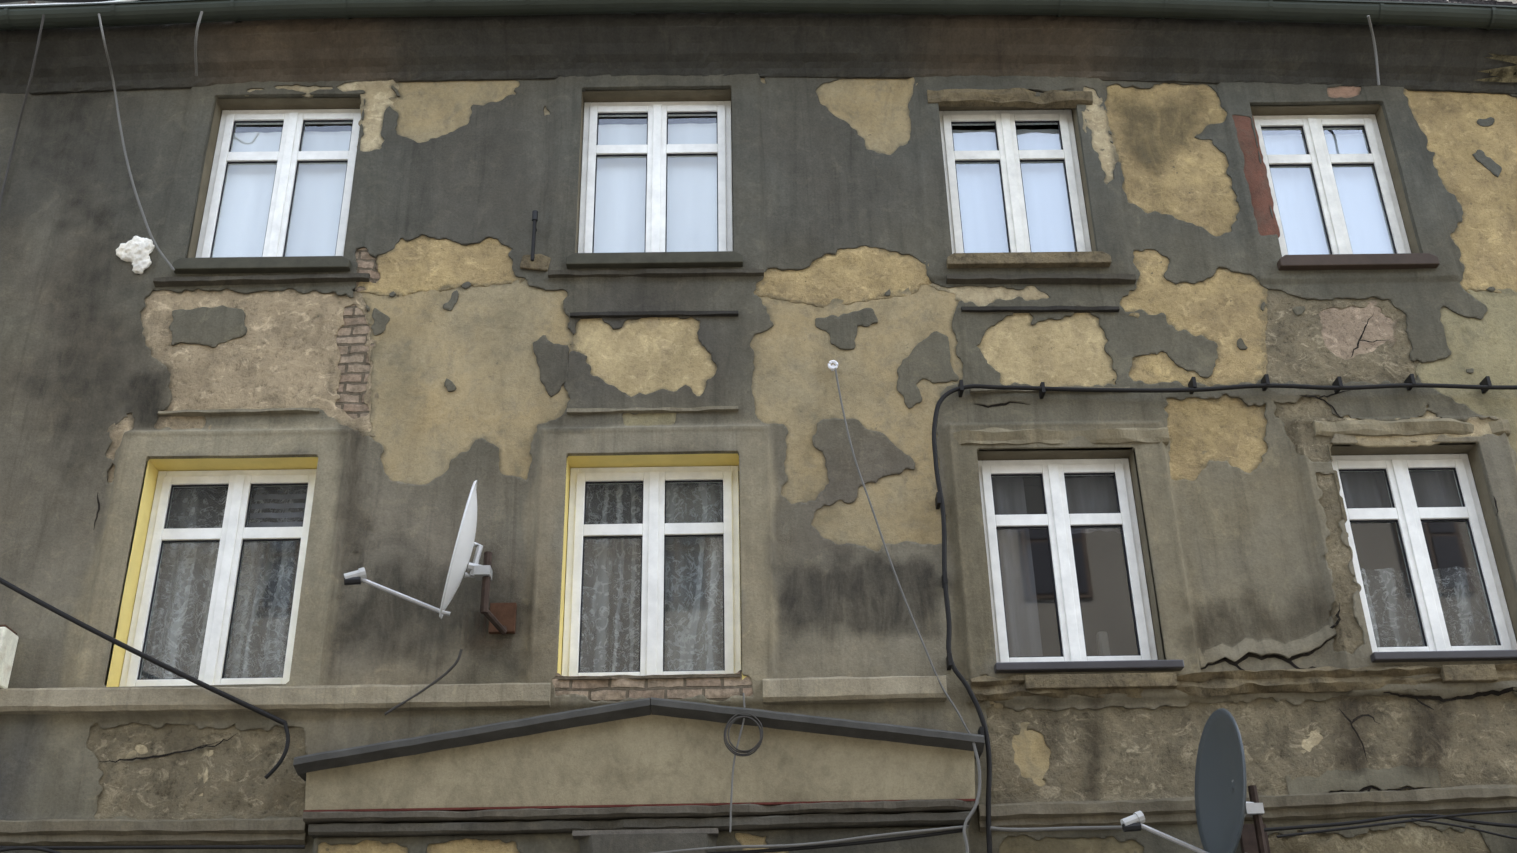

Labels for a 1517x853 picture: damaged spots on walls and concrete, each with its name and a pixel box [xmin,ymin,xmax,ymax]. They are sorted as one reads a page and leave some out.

peeling [245,80,520,152]
peeling [141,235,717,485]
peeling [750,53,1517,654]
spalling [106,413,134,483]
crack [1198,603,1341,670]